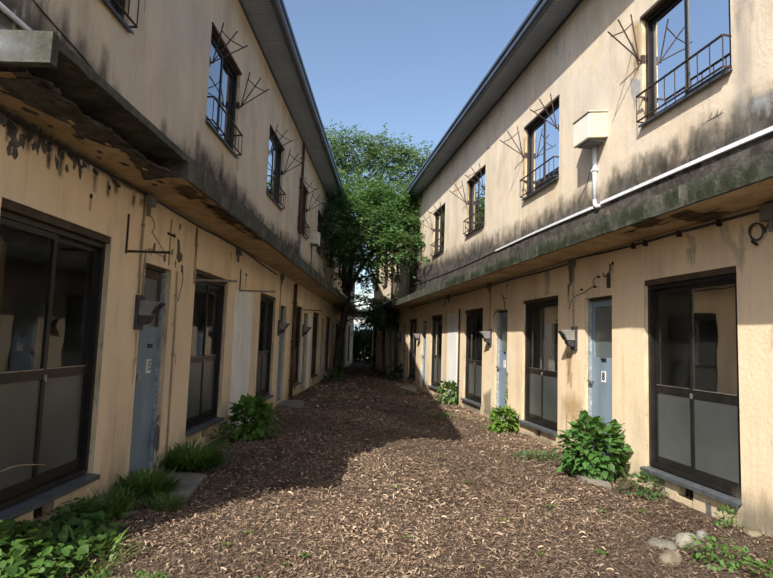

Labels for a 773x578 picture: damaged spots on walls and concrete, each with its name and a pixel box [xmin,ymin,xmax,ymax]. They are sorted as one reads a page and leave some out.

damp [0,105,145,204]
spalling [0,78,170,186]
damp [175,185,263,241]
damp [409,92,773,294]